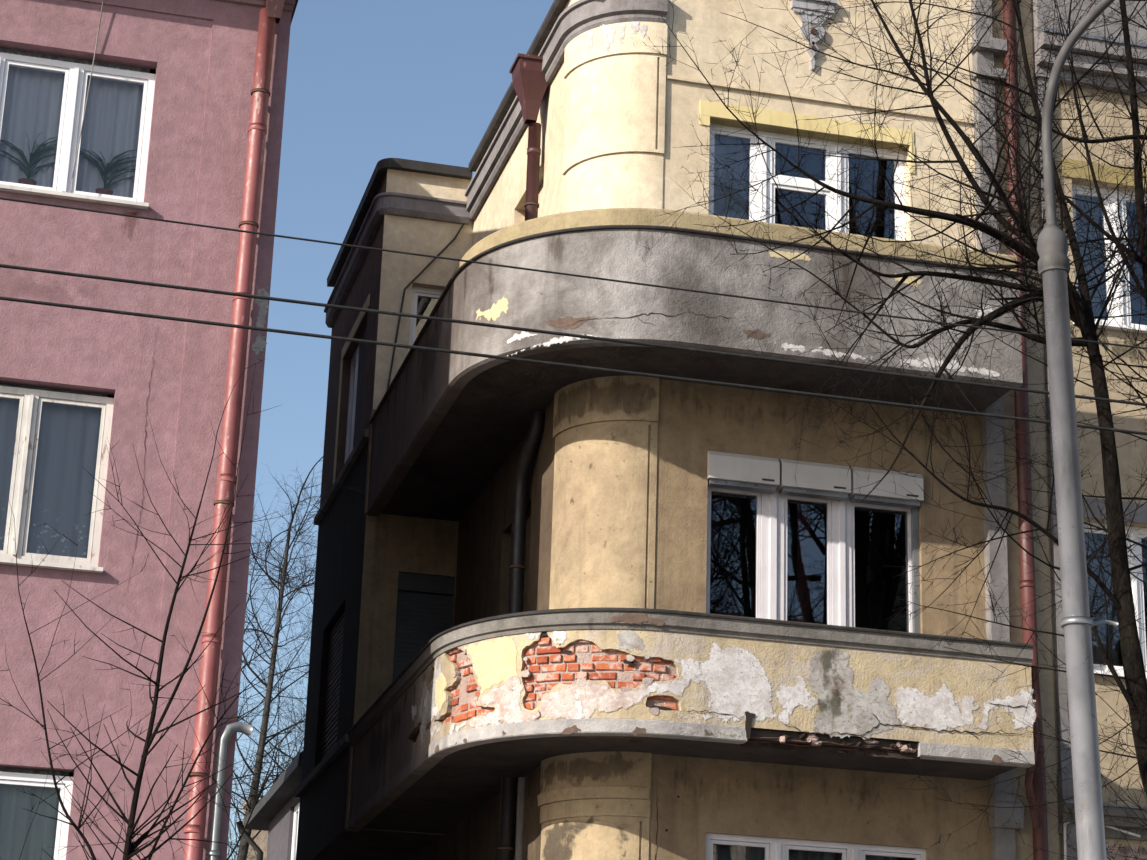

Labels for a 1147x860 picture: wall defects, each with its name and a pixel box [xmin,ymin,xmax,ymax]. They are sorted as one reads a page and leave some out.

peeling [588,21,647,52]
peeling [507,331,537,344]
spalling [547,316,590,329]
crack [569,312,730,326]
spalling [412,629,1036,760]
damp [544,818,593,860]